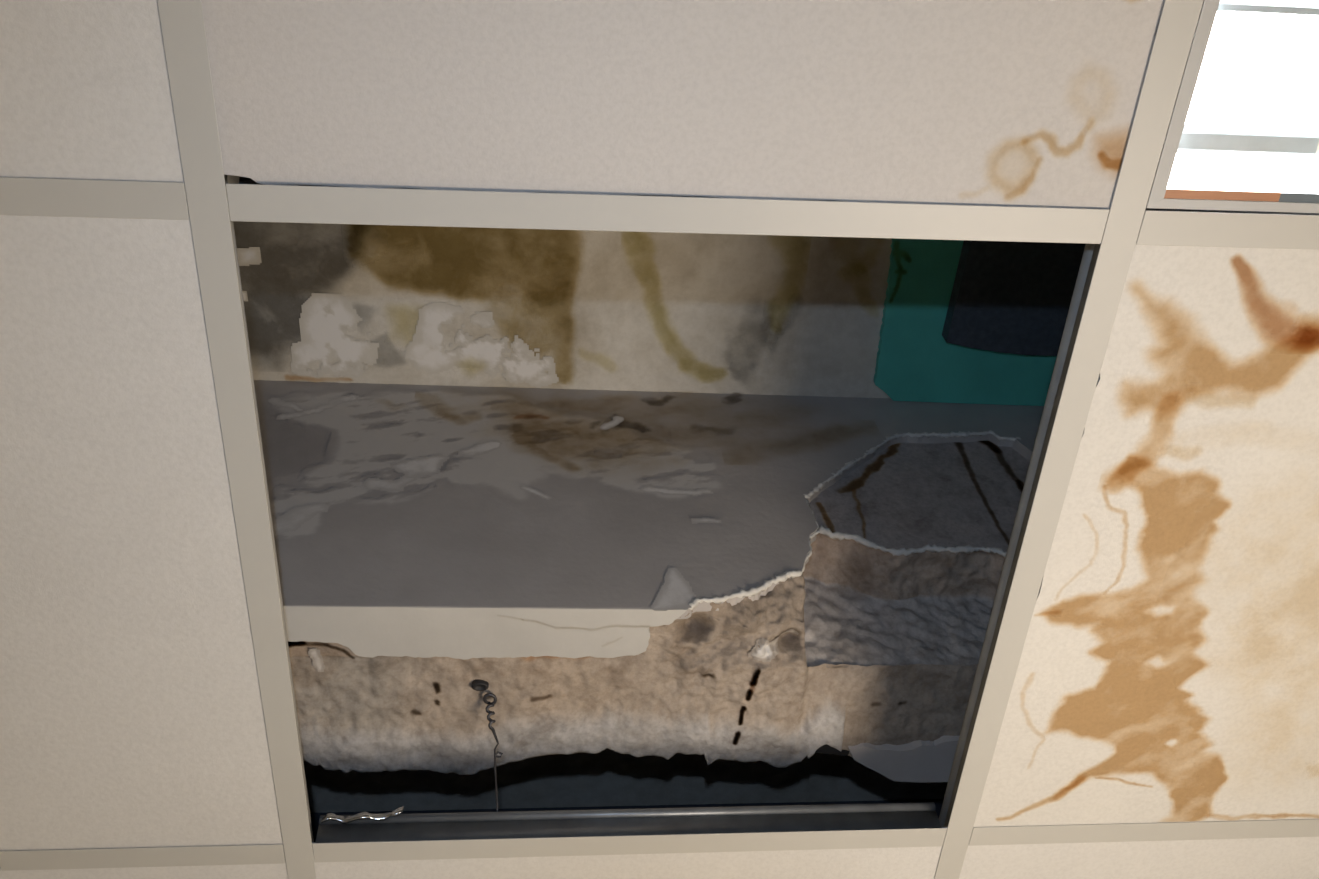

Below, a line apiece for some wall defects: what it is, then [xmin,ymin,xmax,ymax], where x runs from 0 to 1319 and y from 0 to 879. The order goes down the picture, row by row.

leakage [356,224,489,294]
peeling [234,221,730,546]
spalling [288,430,1030,775]